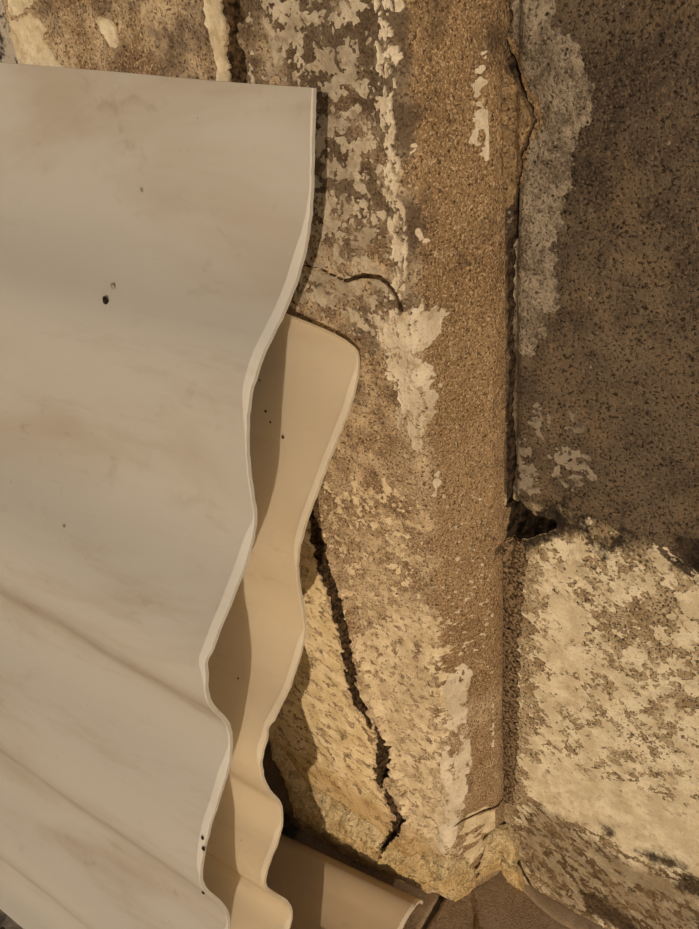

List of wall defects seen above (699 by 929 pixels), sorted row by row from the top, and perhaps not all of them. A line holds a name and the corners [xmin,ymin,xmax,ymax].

peeling [8,0,63,67]
peeling [96,16,119,48]
crack [222,0,247,83]
peeling [246,0,450,455]
crack [305,265,403,312]
crack [505,53,537,508]
peeling [528,402,552,440]
crack [309,509,406,852]
peeling [269,437,699,929]